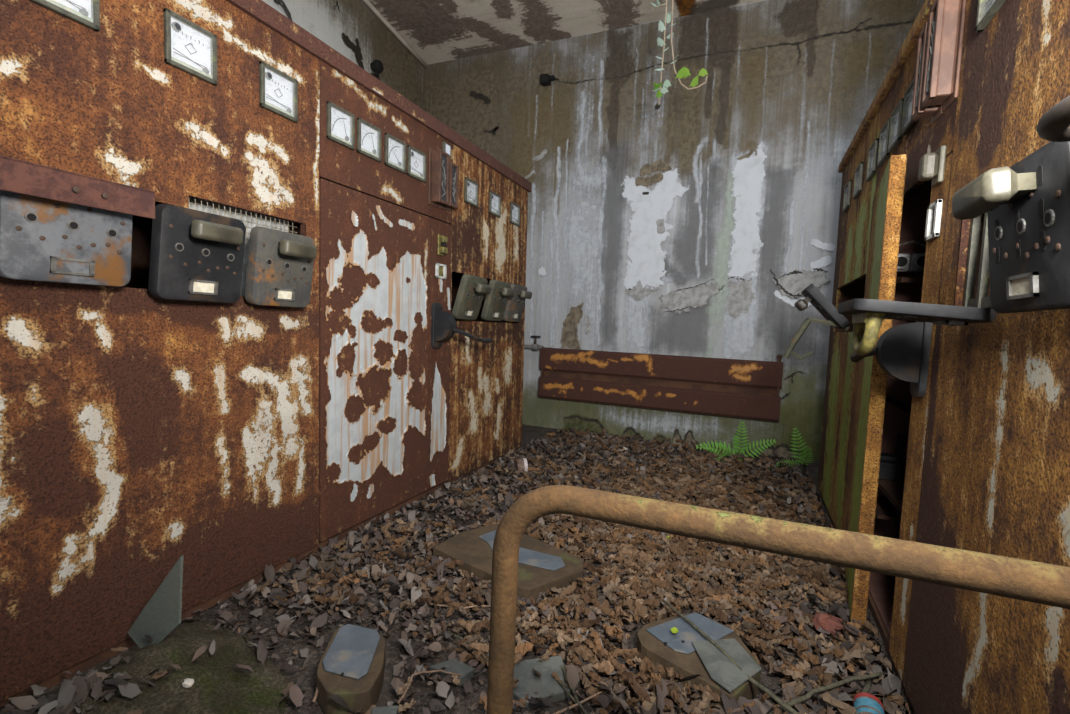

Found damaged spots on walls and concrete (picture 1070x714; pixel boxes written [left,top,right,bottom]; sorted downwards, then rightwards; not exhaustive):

water stain [326,0,925,359]
peeling [621,160,689,301]
peeling [725,144,767,320]
water stain [610,412,717,433]